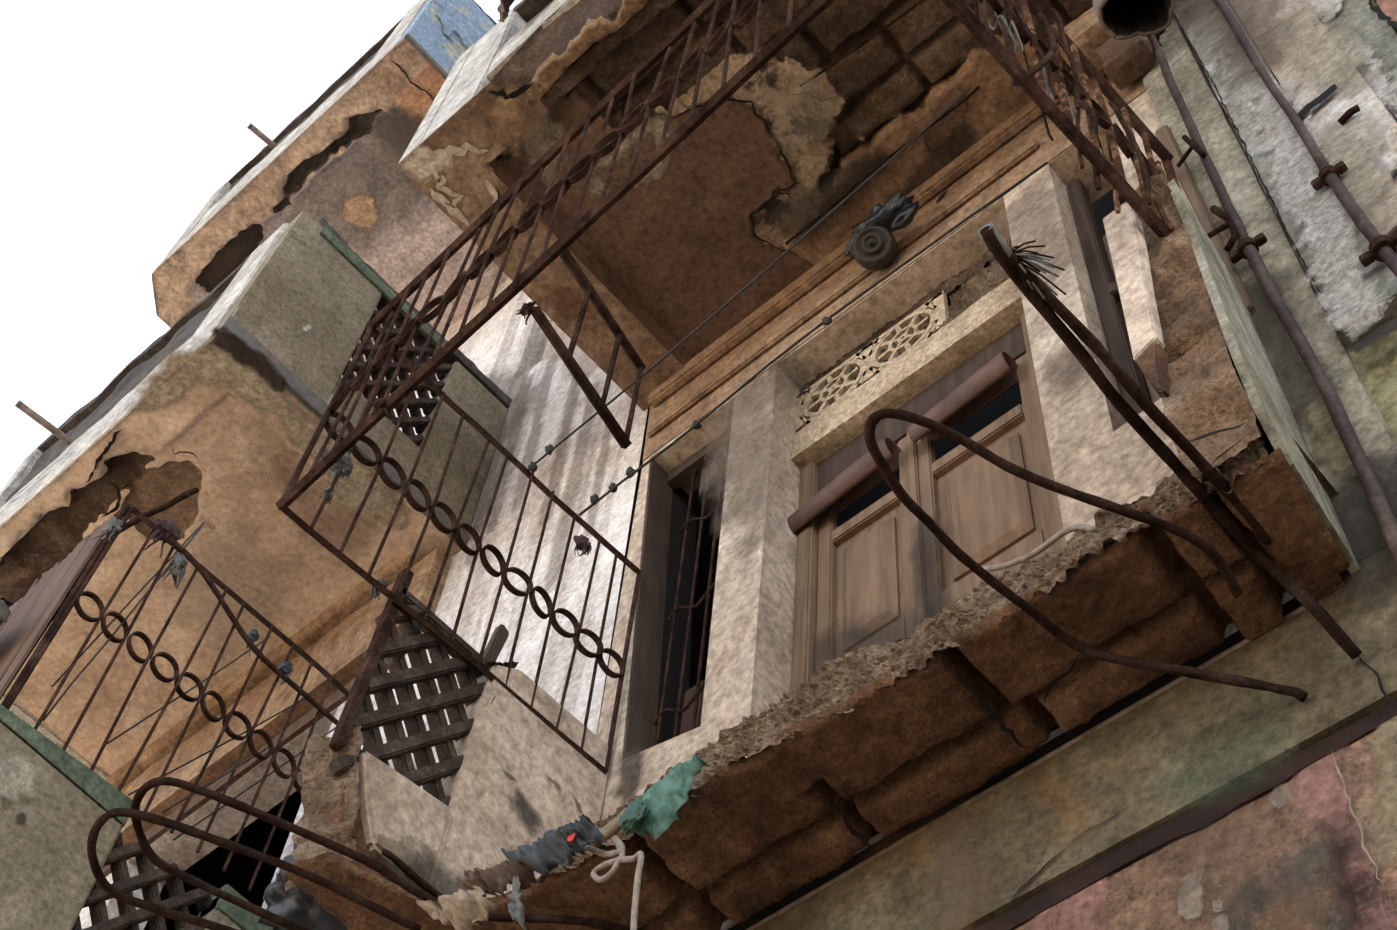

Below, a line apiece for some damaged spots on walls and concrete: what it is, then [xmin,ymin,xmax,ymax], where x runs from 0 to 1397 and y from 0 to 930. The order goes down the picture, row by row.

flaking render [273,109,423,214]
flaking render [491,144,520,167]
flaking render [525,0,1015,248]
flaking render [0,452,202,602]
spalling [688,226,1362,800]
crack [956,660,1025,749]
crack [1044,659,1077,703]
spalling [538,767,673,882]